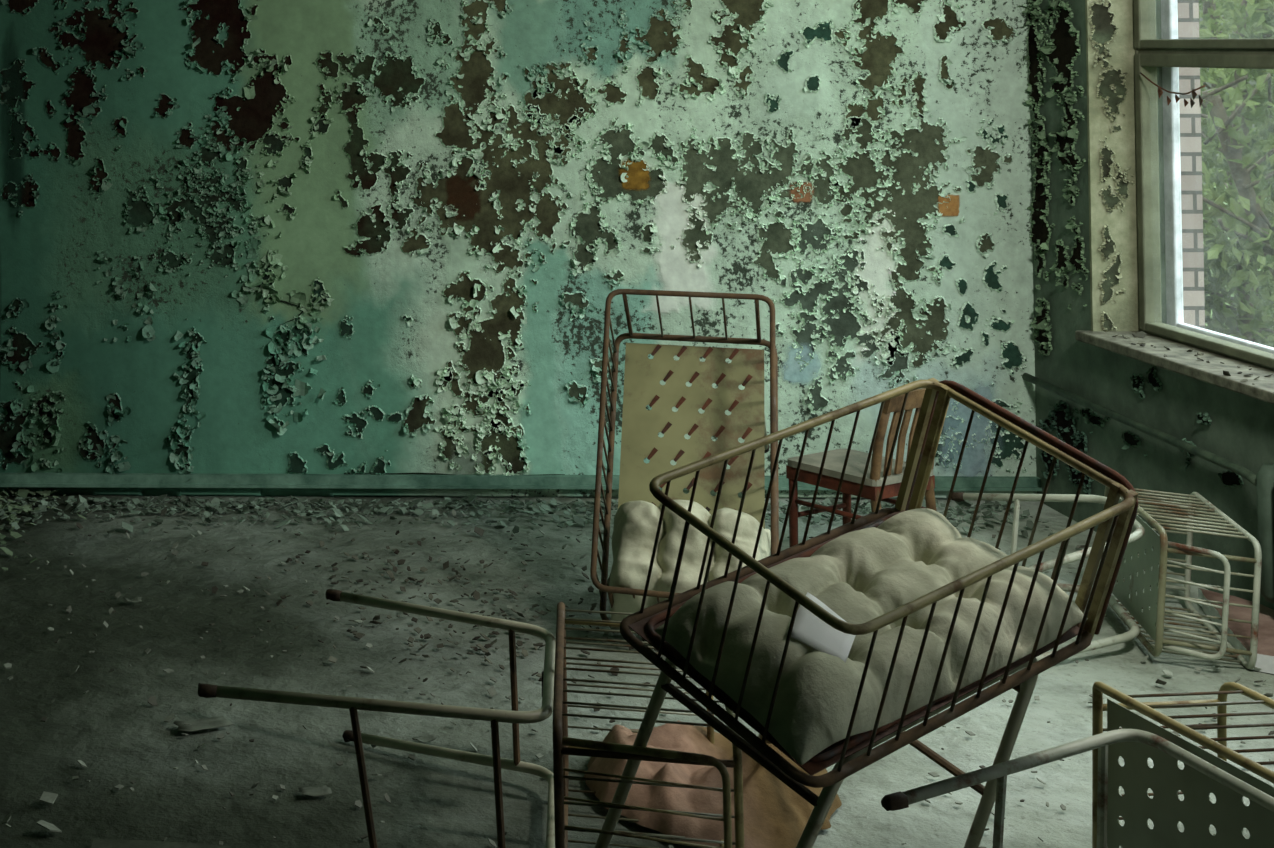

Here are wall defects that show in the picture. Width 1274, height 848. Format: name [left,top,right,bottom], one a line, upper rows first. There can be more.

rust [619,159,650,190]
rust [938,195,960,216]
peeling [0,0,1134,482]
peeling [1129,365,1163,399]
peeling [935,401,1094,495]
peeling [1121,430,1147,458]
peeling [1217,470,1244,488]